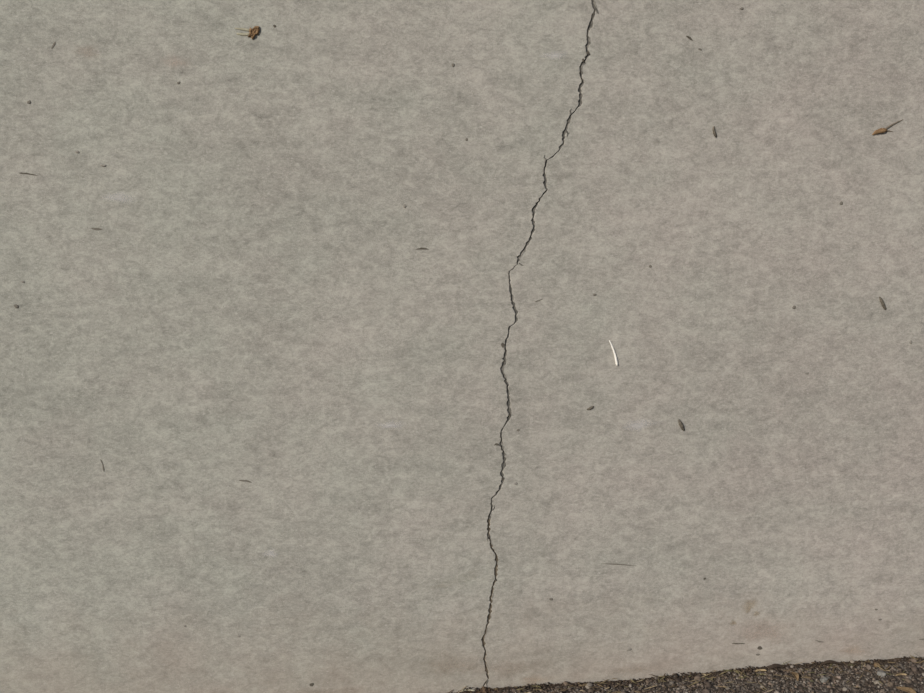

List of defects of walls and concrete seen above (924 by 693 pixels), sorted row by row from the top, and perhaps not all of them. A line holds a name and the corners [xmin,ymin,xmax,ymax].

crack [481,0,599,687]